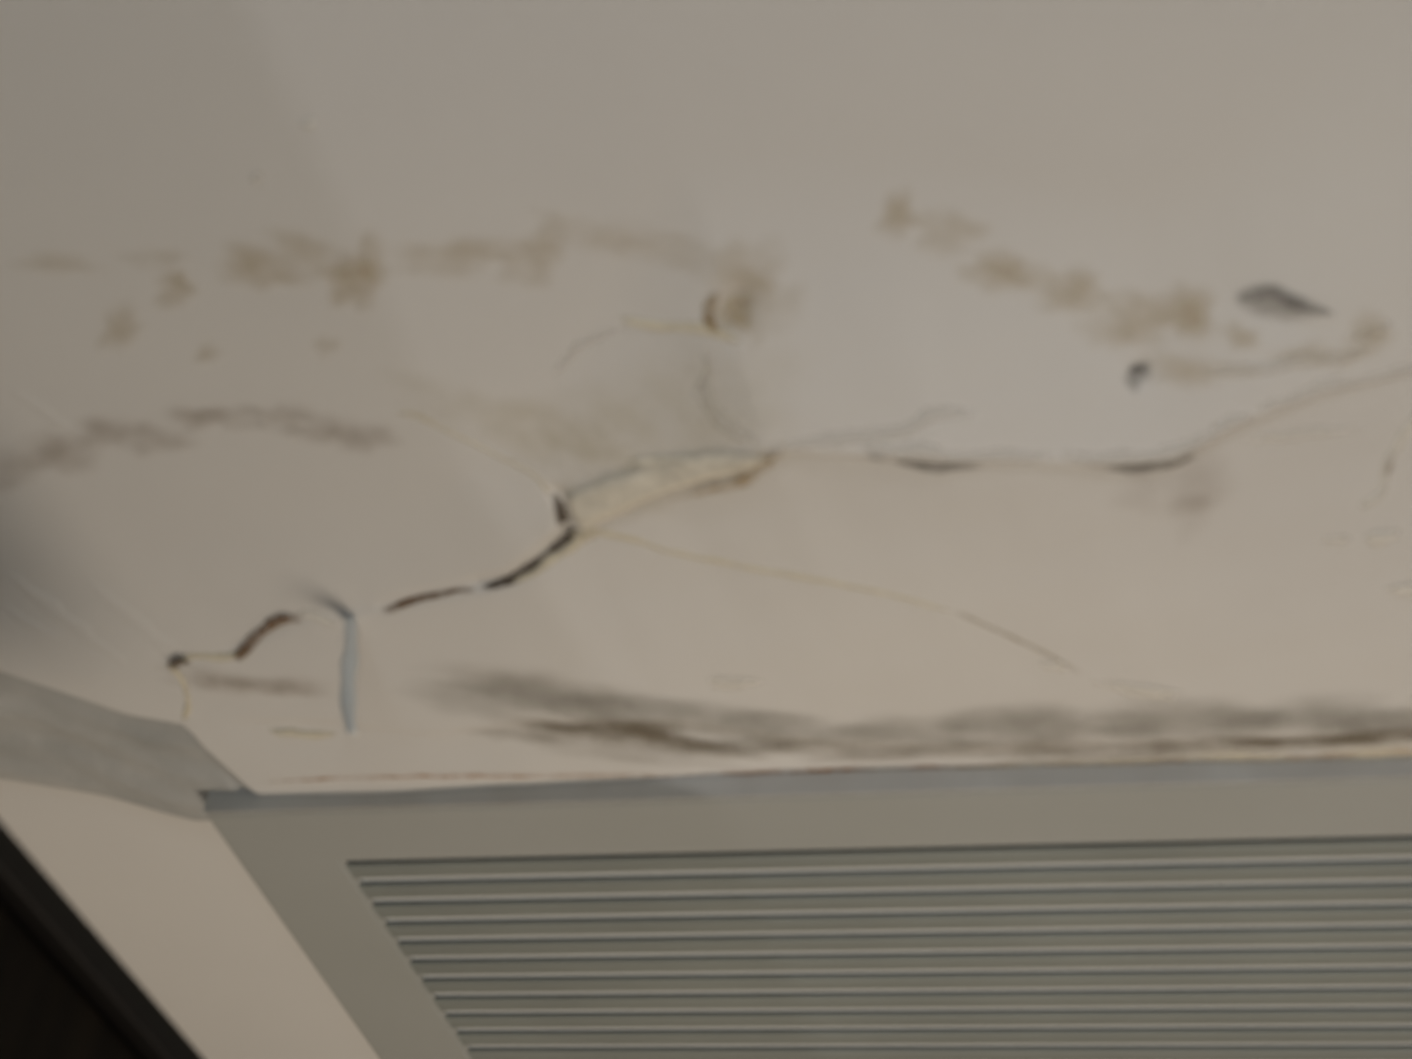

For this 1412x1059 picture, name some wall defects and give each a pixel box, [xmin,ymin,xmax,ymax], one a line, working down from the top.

crack [389,496,939,609]
peeling [0,611,359,821]